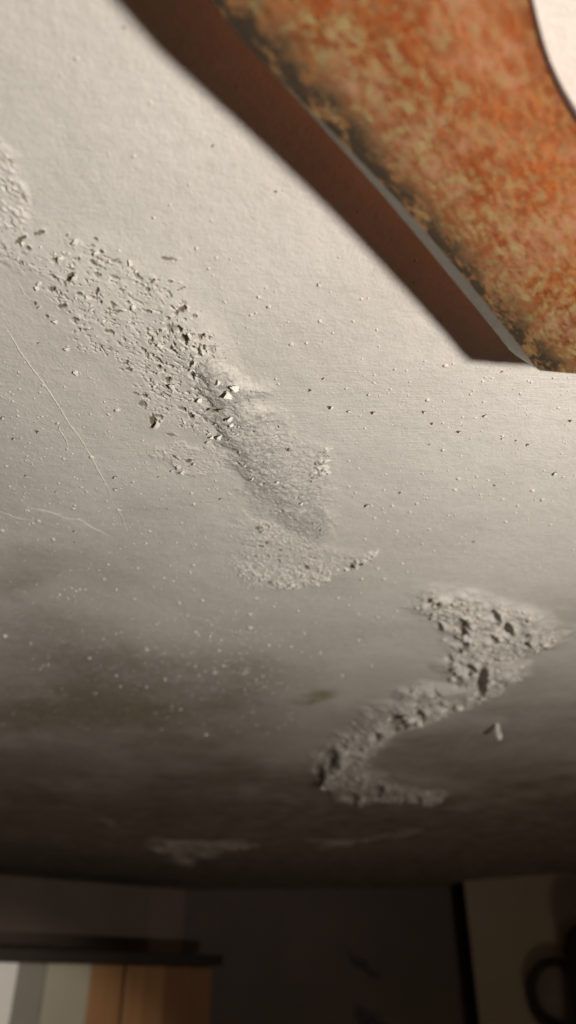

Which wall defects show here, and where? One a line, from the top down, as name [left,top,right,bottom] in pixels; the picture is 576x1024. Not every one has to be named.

peeling [0,207,242,489]
peeling [214,498,381,594]
peeling [307,447,337,482]
flaking render [300,581,576,808]